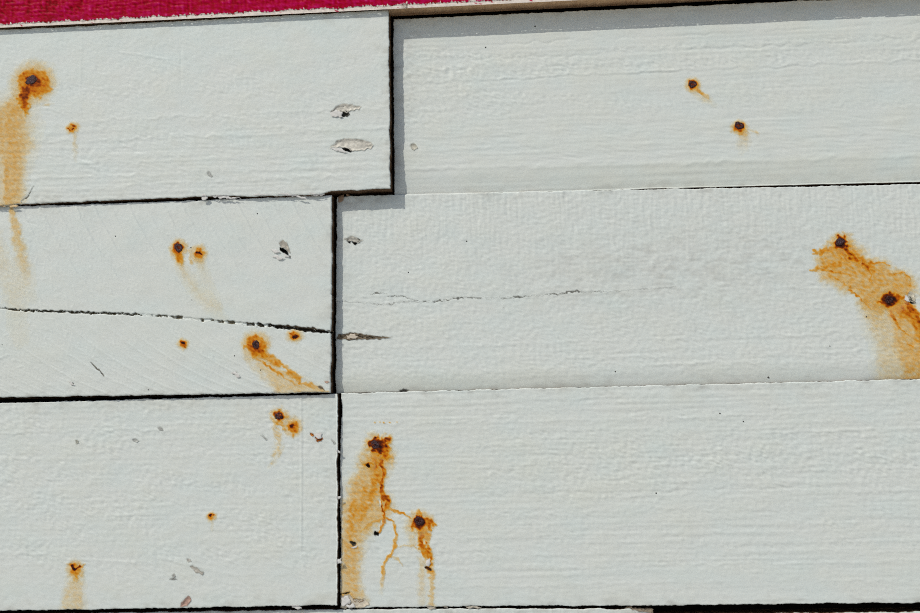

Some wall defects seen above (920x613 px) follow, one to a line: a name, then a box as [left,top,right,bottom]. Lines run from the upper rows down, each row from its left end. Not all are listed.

rust [0,67,53,250]
rust [171,240,206,265]
crack [4,307,334,334]
rust [809,233,920,379]
rust [243,333,324,392]
rust [270,409,299,437]
rust [341,434,437,605]
rust [68,562,84,581]